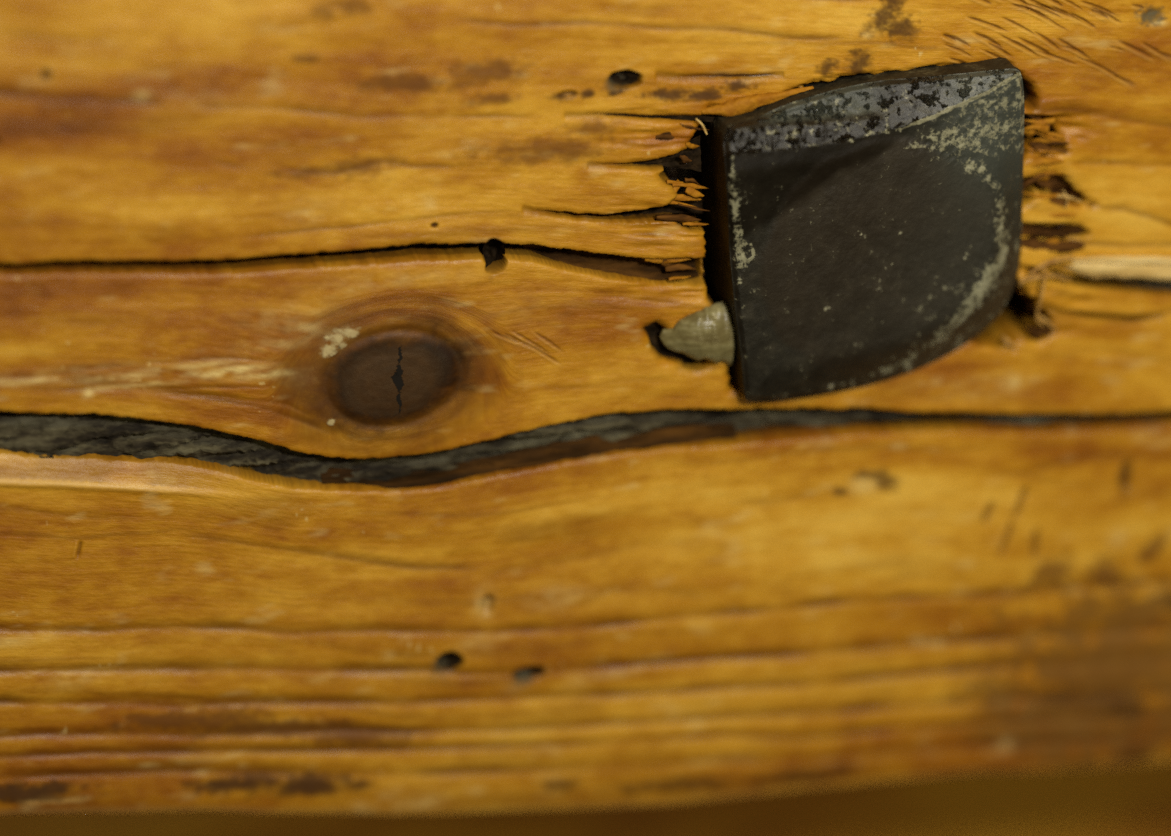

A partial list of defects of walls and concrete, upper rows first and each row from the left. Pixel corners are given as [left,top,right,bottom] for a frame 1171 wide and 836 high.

crack [604,113,715,216]
crack [93,239,704,280]
crack [1052,271,1171,290]
crack [391,346,404,412]
crack [0,407,1171,489]